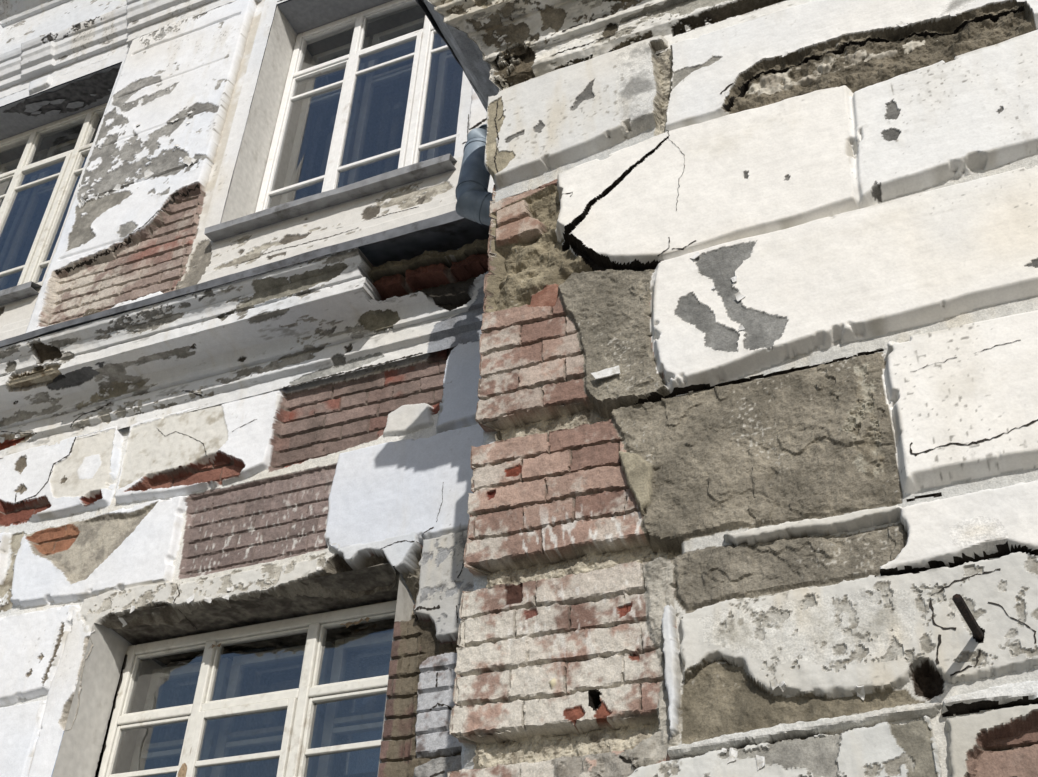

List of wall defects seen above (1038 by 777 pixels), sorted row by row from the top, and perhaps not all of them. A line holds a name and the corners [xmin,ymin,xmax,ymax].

peeling [439,0,786,181]
spalling [720,0,1038,114]
peeling [880,98,902,142]
spalling [3,62,341,328]
crack [561,130,696,272]
crack [380,482,444,550]
spalling [0,180,973,777]
crack [910,419,1038,456]
crack [874,541,1038,677]
peeling [952,555,1038,670]
crack [942,696,1038,717]
spalling [963,709,1038,777]